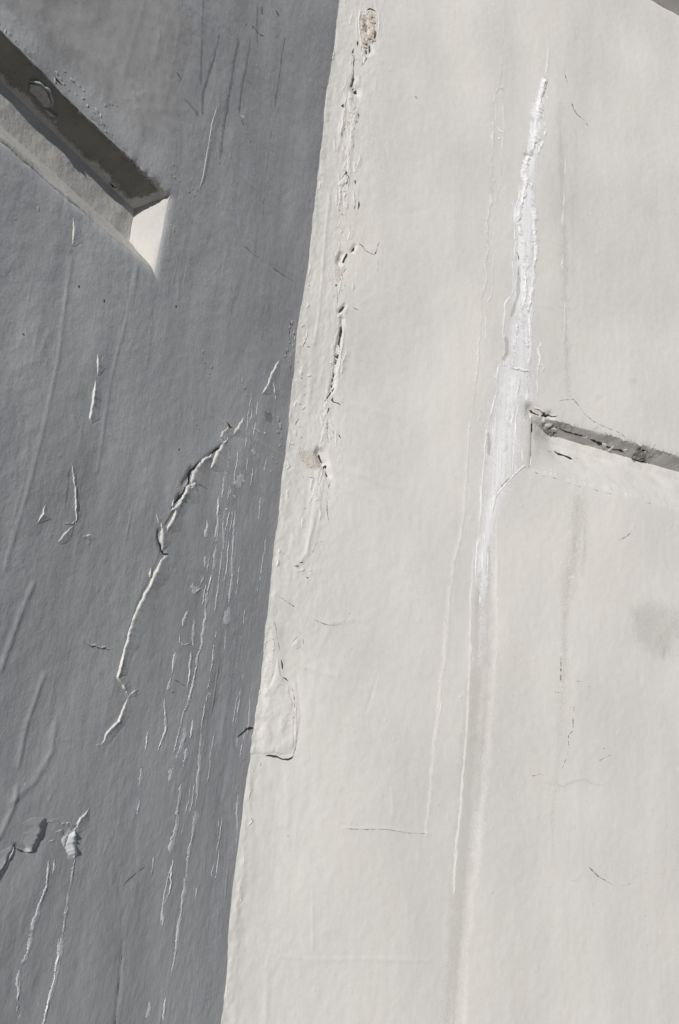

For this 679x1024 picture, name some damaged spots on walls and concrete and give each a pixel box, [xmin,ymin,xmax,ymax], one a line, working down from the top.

peeling [328,8,381,296]
peeling [265,307,349,523]
crack [497,399,627,491]
peeling [64,464,79,526]
peeling [0,817,47,879]